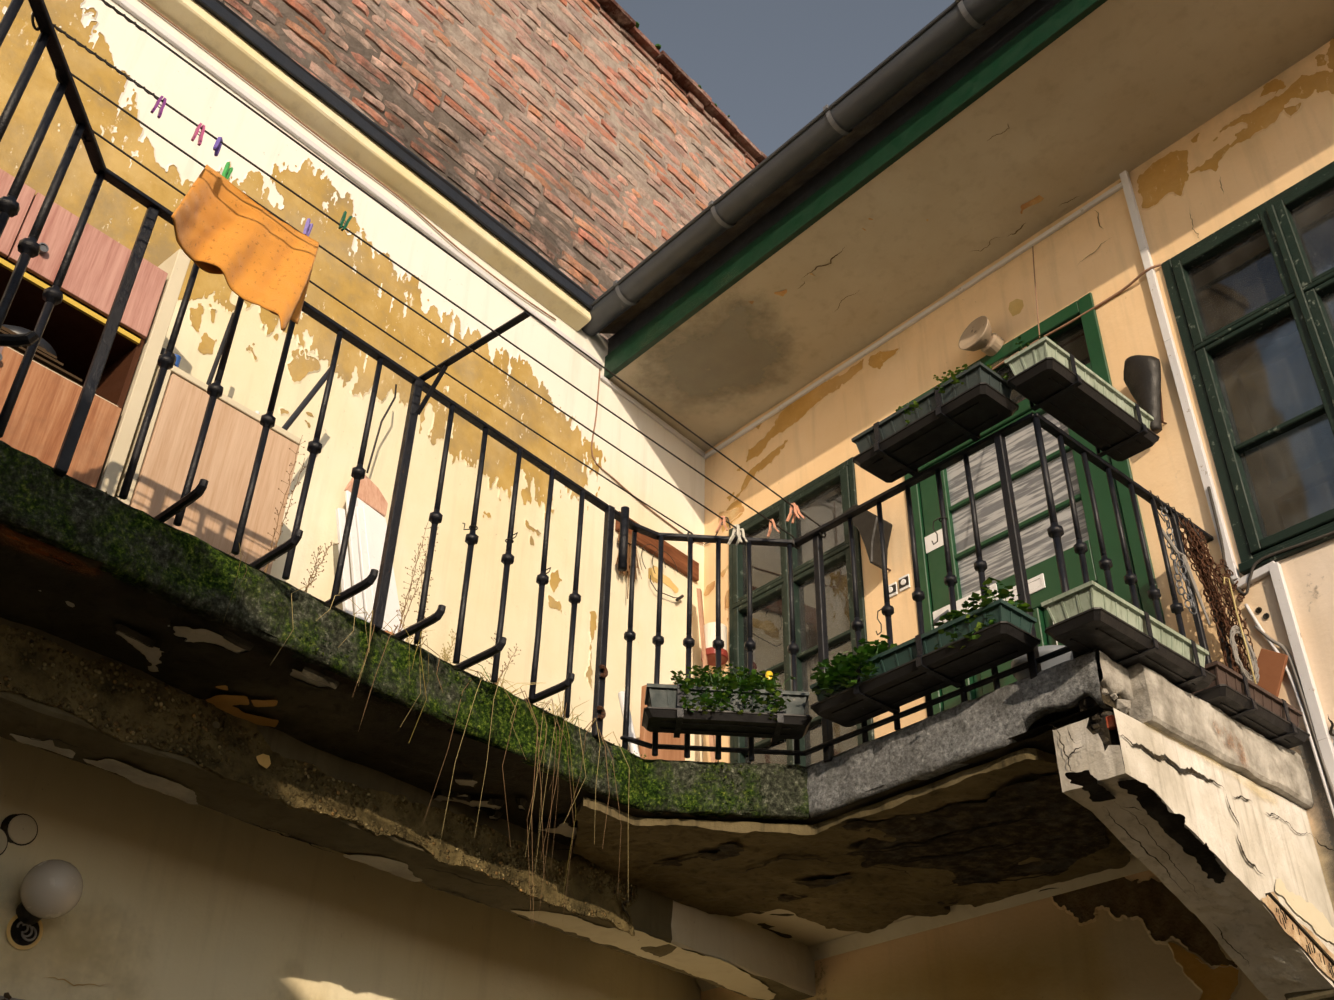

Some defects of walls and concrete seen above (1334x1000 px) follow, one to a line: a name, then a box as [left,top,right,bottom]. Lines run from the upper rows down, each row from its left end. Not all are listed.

peeling [1115,38,1334,210]
peeling [0,0,606,547]
leakage [654,302,783,399]
peeling [113,621,254,672]
peeling [546,568,562,612]
peeling [10,734,198,804]
spalling [206,685,638,936]
spalling [841,685,1227,885]
crack [1052,725,1083,772]
crack [1121,735,1334,875]
spalling [1050,875,1242,1000]
crack [1108,805,1249,962]